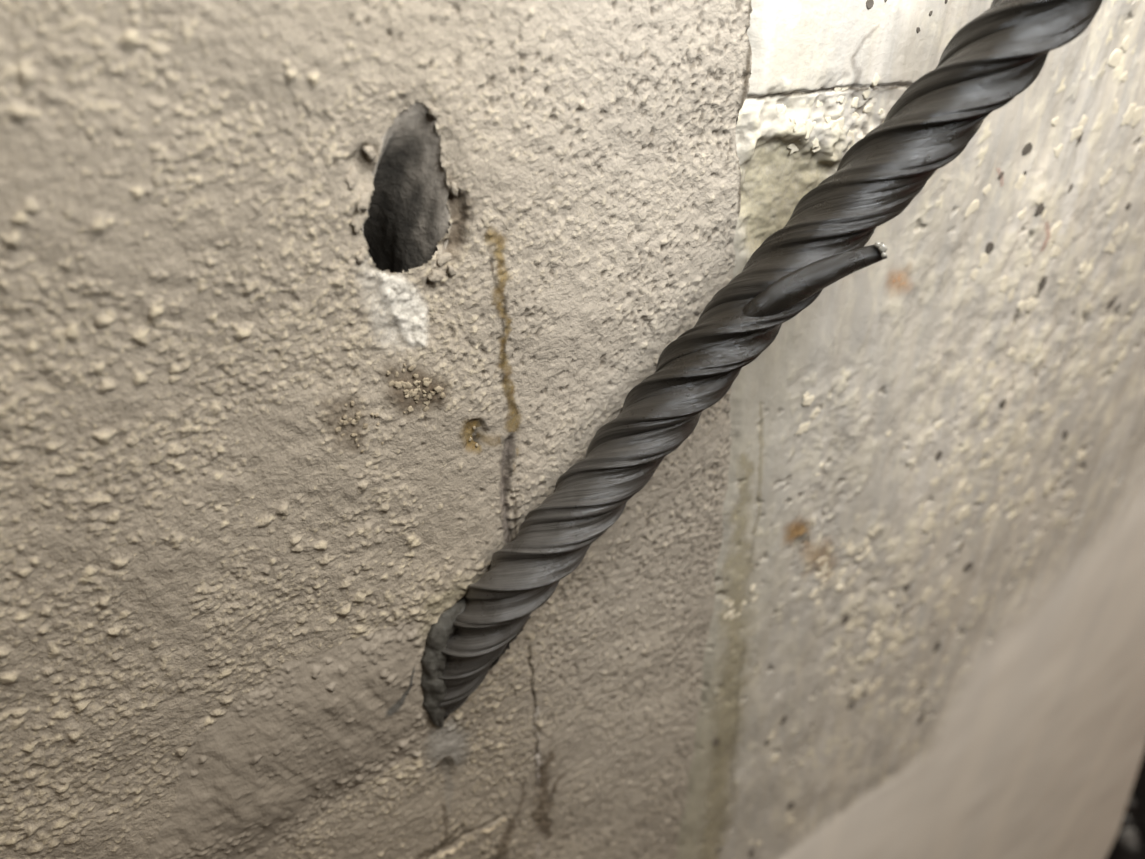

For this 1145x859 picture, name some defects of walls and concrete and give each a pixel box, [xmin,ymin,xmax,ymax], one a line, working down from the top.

crack [740,0,909,107]
peeling [361,145,377,161]
spalling [740,73,885,252]
peeling [344,165,370,264]
spalling [427,181,468,282]
corrosion [464,419,480,451]
crack [527,646,541,782]
crack [419,812,506,859]